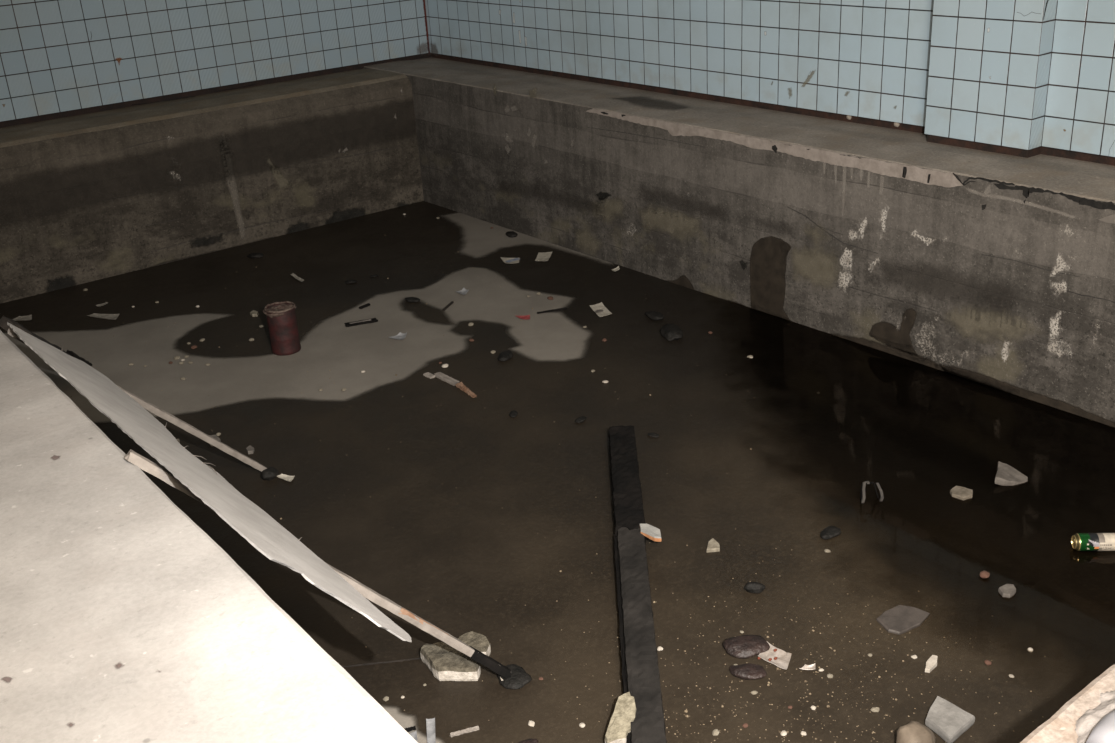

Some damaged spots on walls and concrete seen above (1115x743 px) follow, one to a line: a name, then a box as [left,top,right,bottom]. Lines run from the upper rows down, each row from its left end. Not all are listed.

spalling [0,57,1115,422]
crack [952,173,1015,185]
water stain [967,186,1081,238]
water stain [0,192,1115,743]